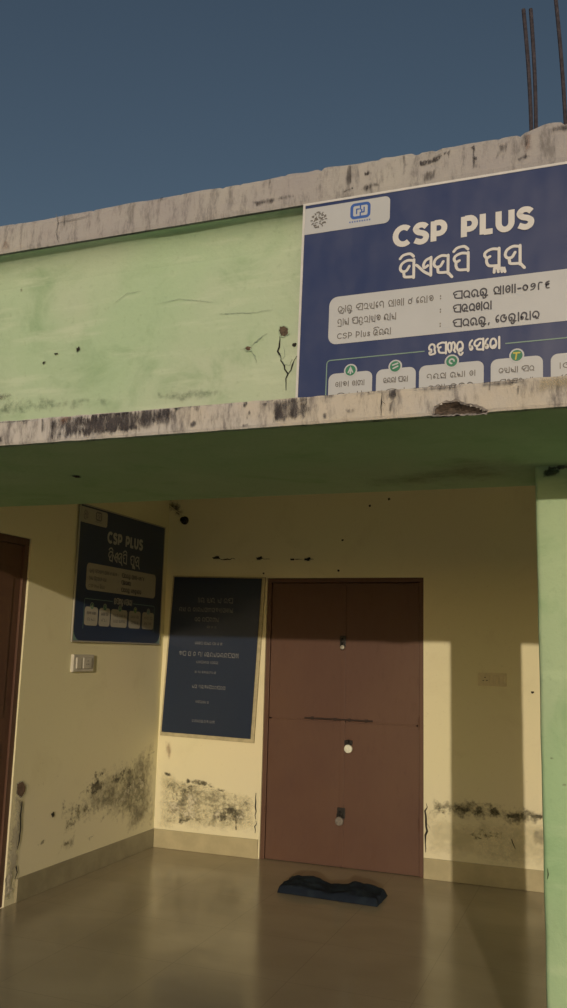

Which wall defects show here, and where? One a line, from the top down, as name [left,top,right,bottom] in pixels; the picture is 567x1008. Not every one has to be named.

crack [277,338,297,382]
water stain [264,397,307,420]
spalling [432,399,488,417]
water stain [42,408,176,439]
mould [436,802,543,822]